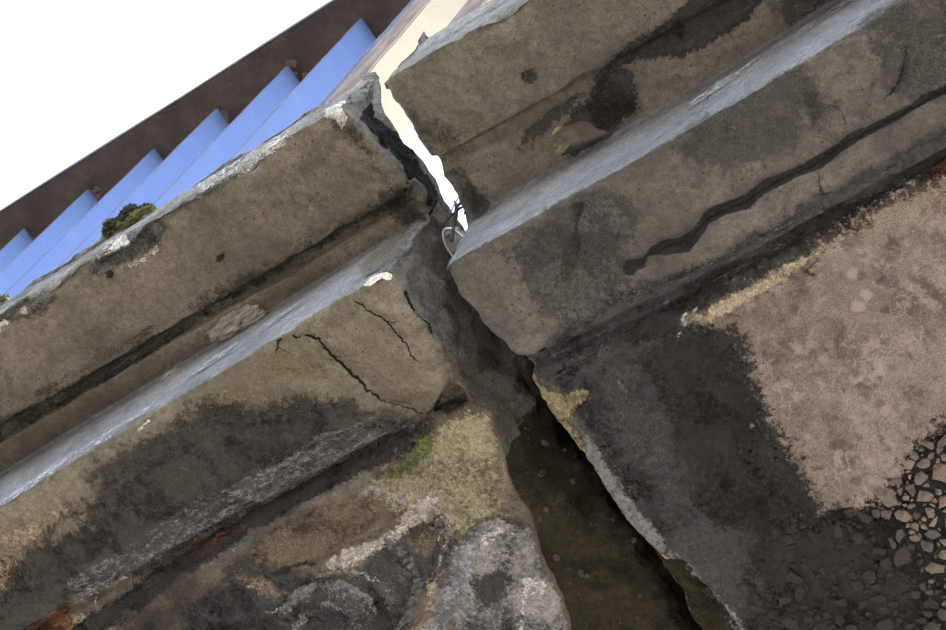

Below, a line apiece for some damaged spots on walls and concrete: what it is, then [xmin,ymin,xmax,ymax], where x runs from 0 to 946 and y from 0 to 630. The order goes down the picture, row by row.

water stain [518,0,761,150]
water stain [672,59,844,177]
crack [623,47,946,276]
crack [275,334,430,414]
crack [353,290,433,362]
water stain [0,366,569,630]
corrosion [25,608,86,630]